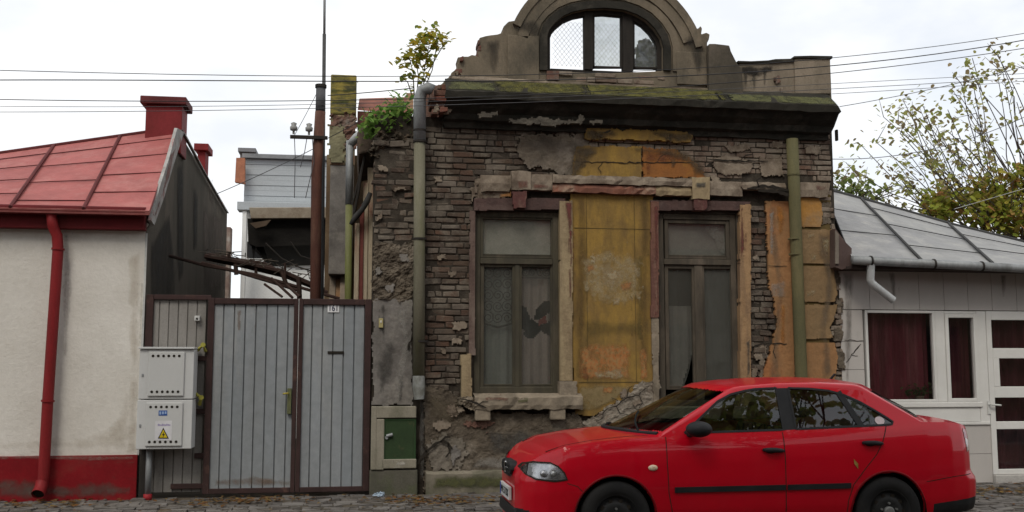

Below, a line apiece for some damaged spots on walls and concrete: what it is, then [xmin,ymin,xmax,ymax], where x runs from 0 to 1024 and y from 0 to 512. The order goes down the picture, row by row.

spalling [588,133,835,248]
spalling [371,40,603,472]
peeling [566,203,644,304]
spalling [738,206,776,377]
spalling [830,270,846,381]
crack [596,386,648,422]